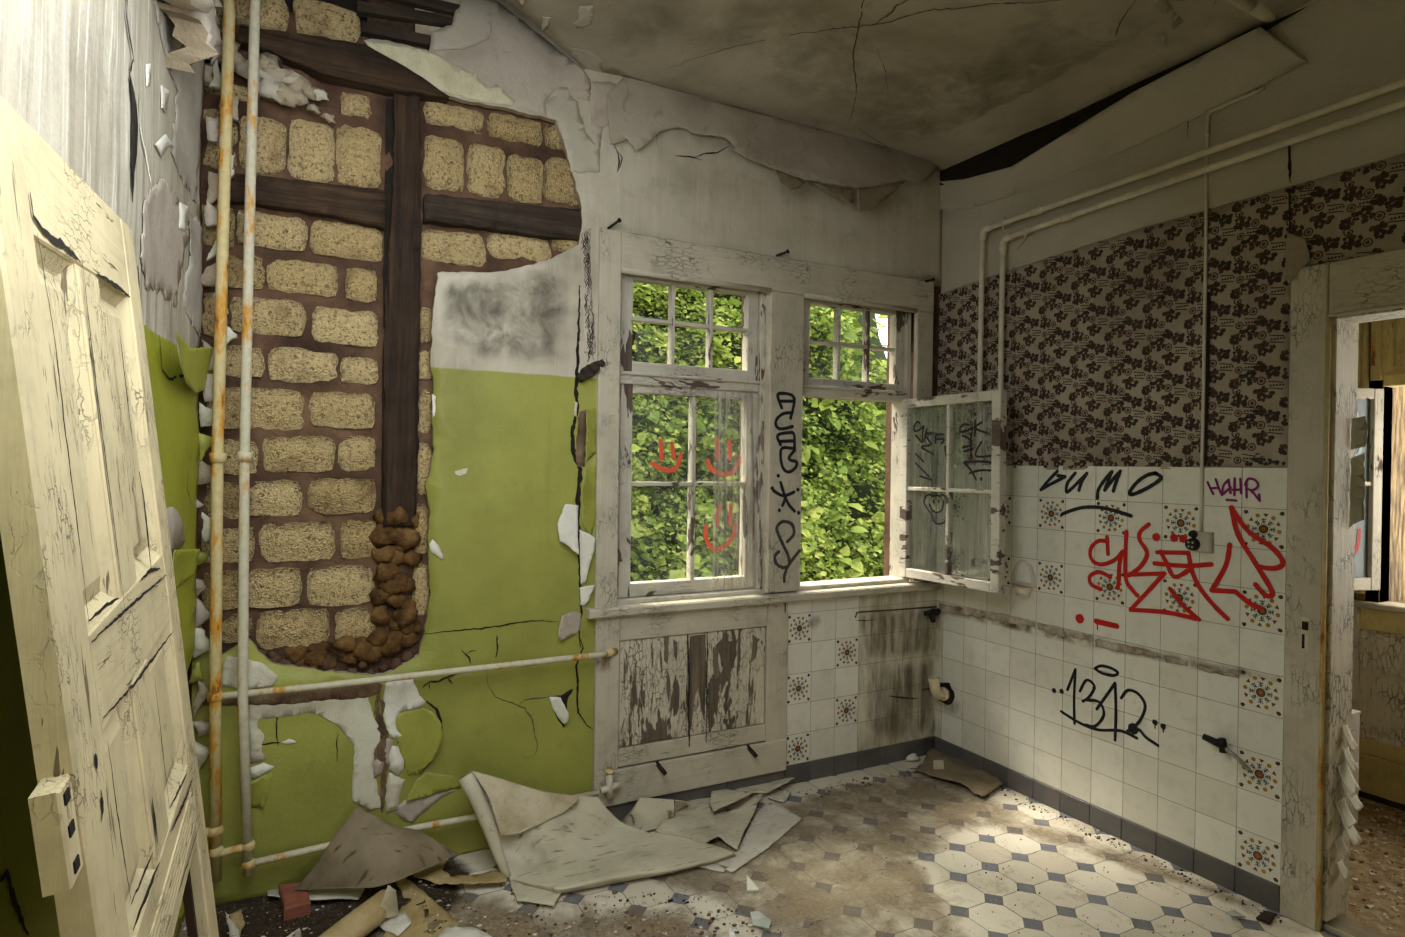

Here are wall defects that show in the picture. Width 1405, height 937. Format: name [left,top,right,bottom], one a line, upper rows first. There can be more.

crack [668,0,1059,146]
damp [449,289,501,316]
flaking render [140,0,622,823]
crack [422,228,596,758]
crack [262,717,280,746]
crack [374,684,389,812]
peeling [664,634,731,734]
peeling [751,634,759,662]